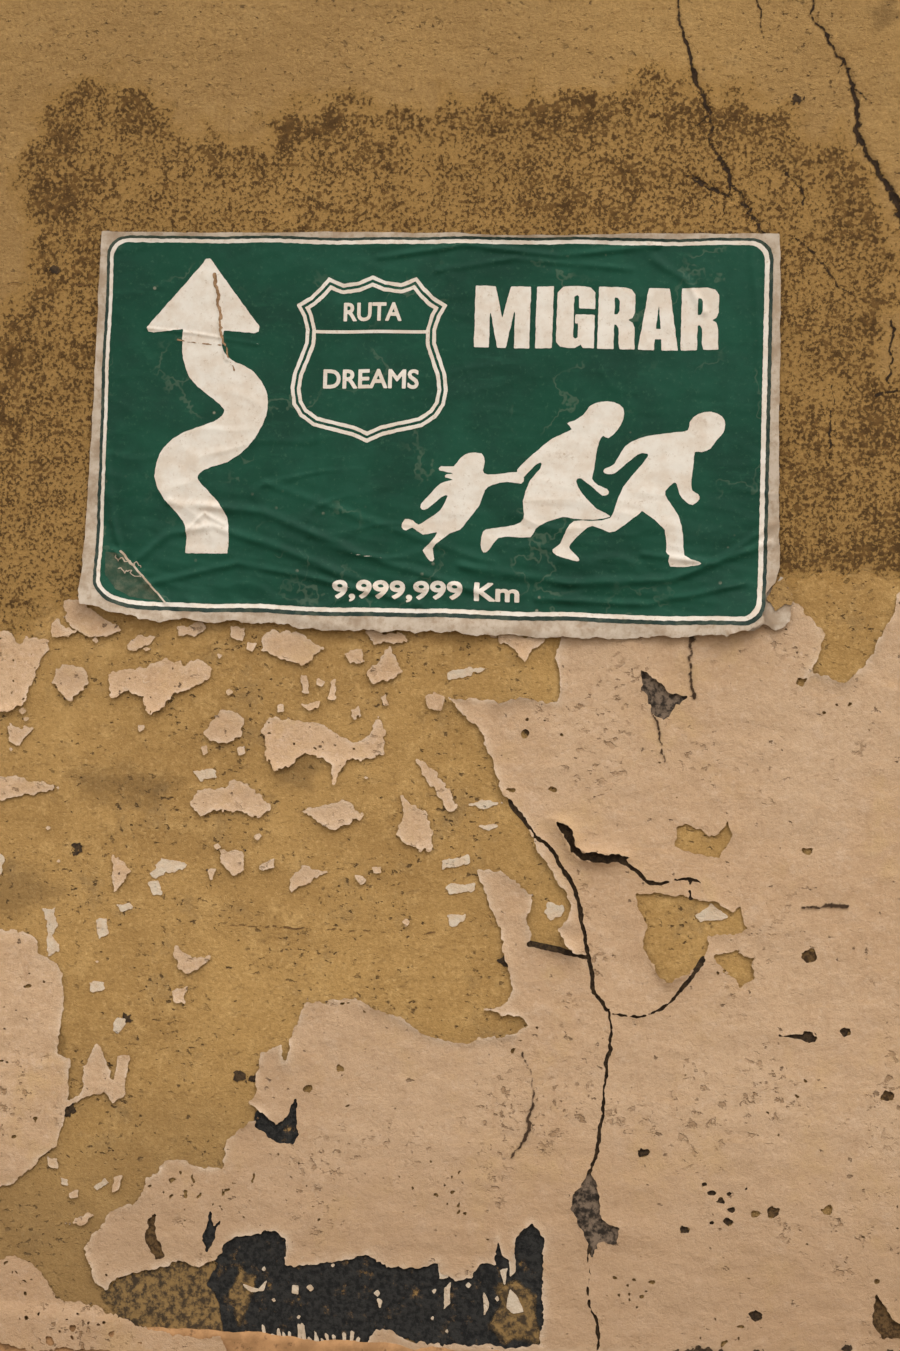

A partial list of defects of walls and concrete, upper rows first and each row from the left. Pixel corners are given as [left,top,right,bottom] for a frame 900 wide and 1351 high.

crack [677,0,855,297]
crack [810,0,900,229]
water stain [0,58,900,635]
crack [875,319,900,397]
peeling [767,570,900,687]
peeling [641,670,692,720]
peeling [556,822,629,864]
peeling [0,589,572,1349]
crack [508,799,705,1174]
peeling [636,892,755,988]
peeling [569,1171,619,1257]
crack [586,1246,600,1350]